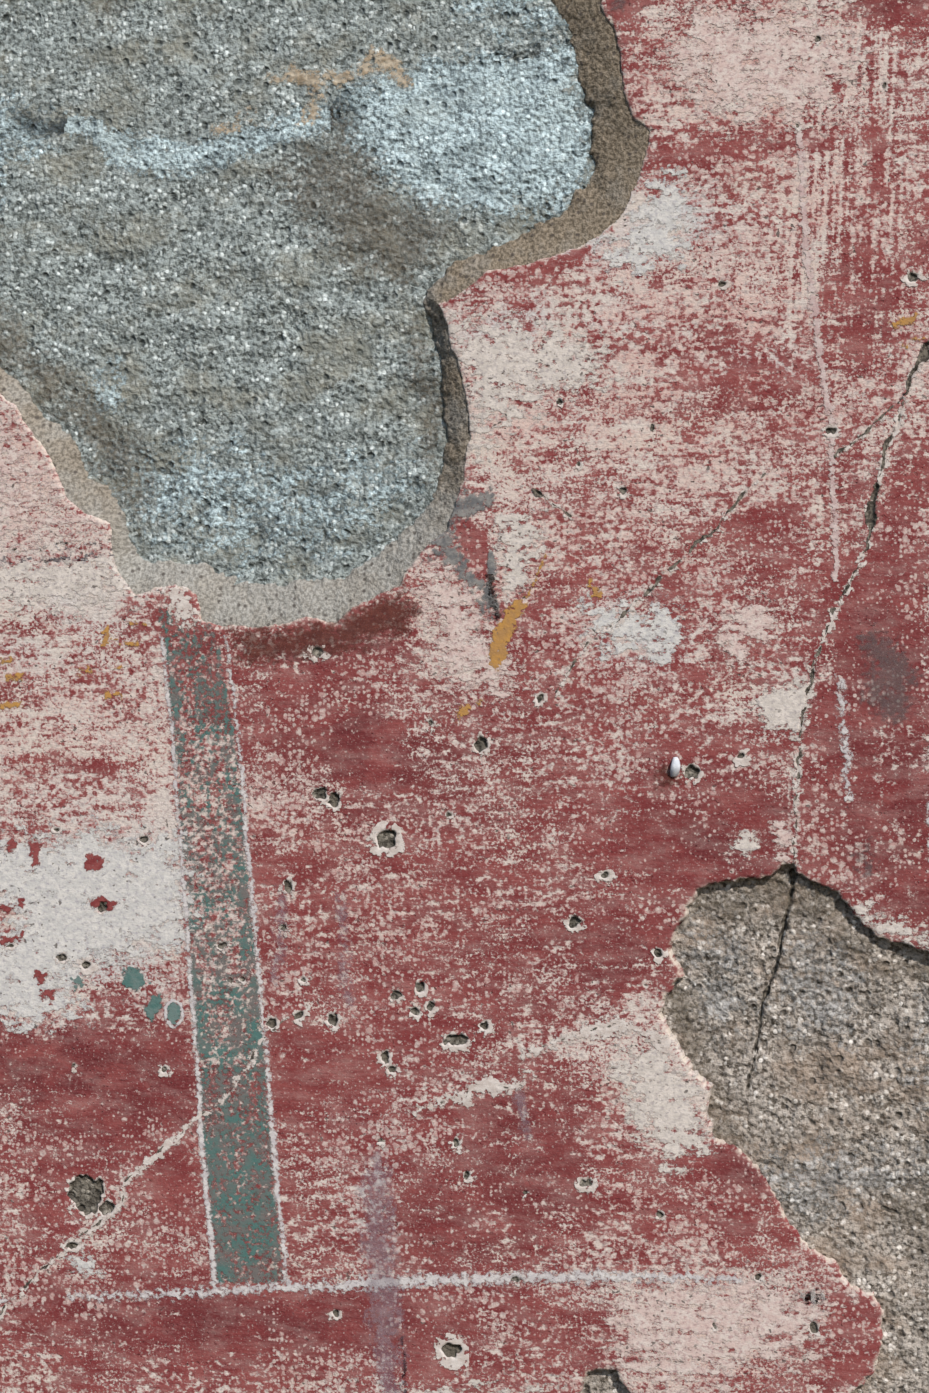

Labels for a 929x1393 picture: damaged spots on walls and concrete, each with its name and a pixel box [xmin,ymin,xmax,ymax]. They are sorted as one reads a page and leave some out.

peeling [650,0,889,142]
spalling [0,0,698,707]
spalling [822,423,841,438]
crack [553,468,769,697]
crack [747,340,929,1089]
spalling [347,820,929,1393]
spalling [328,1309,342,1320]